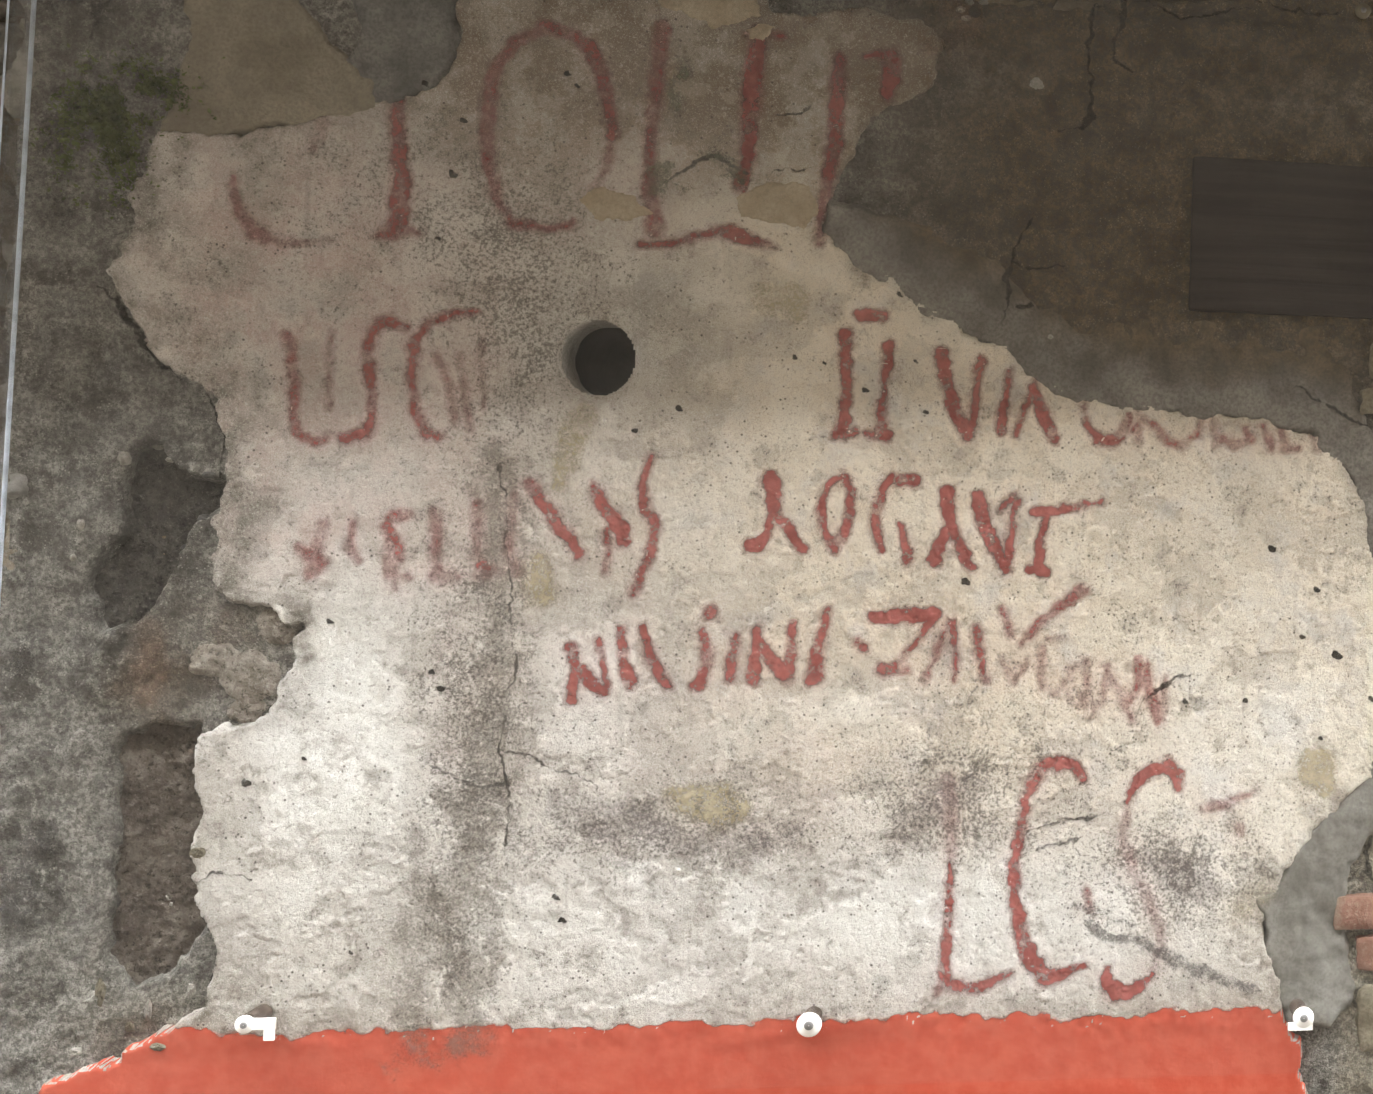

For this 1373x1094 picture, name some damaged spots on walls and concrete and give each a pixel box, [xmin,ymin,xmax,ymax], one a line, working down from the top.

crack [1062,0,1338,131]
crack [1002,218,1064,314]
spalling [94,445,227,628]
crack [431,463,588,847]
spalling [110,724,207,985]
spalling [149,1043,166,1051]